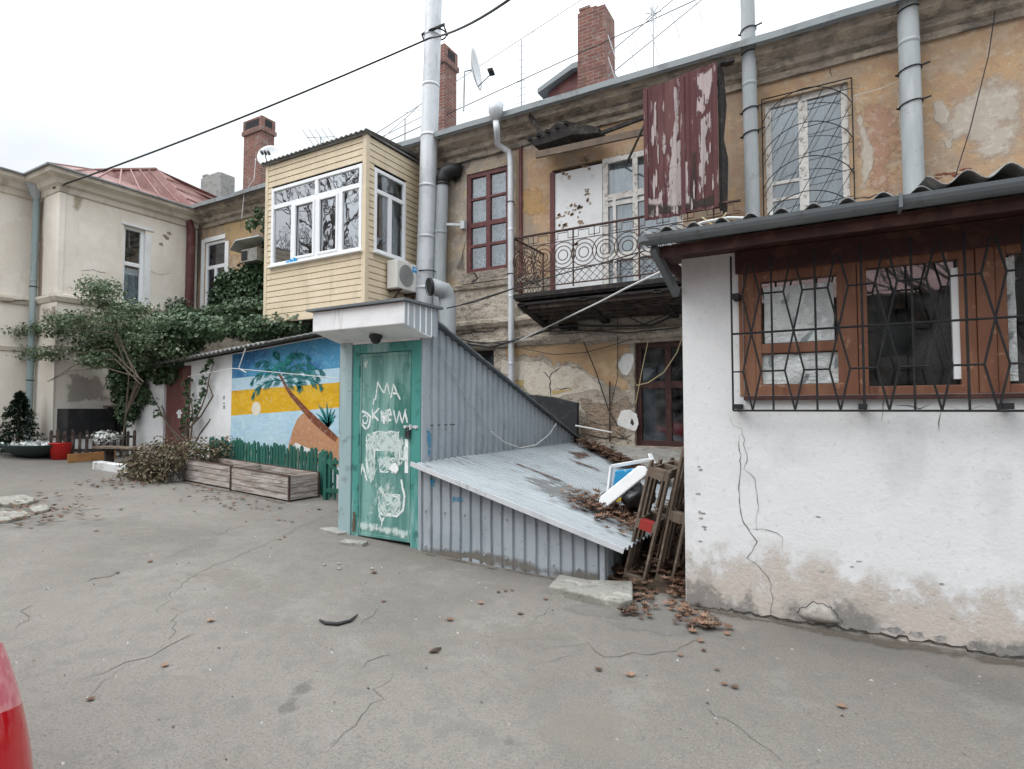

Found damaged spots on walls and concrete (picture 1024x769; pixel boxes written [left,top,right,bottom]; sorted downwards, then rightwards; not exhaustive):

peeling [648,68,714,218]
flaking render [933,77,1022,157]
flaking render [68,375,106,402]
flaking render [500,342,631,443]
crack [690,418,1024,658]
leakage [686,581,758,617]
leakage [788,603,874,635]